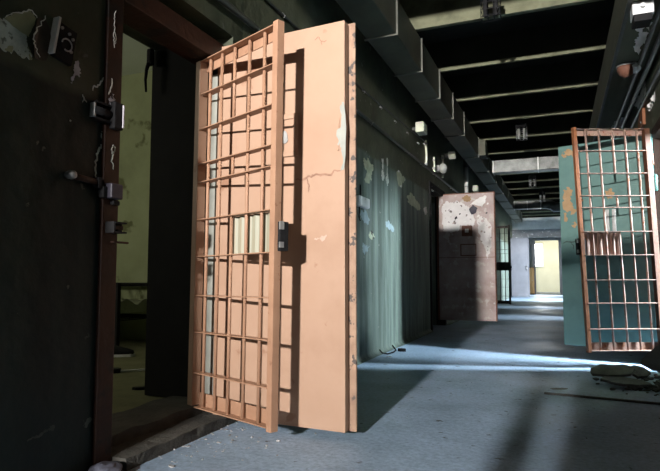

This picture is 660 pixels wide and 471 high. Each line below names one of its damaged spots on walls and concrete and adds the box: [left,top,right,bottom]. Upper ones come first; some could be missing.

peeling [0,9,51,61]
peeling [336,102,346,170]
crack [296,170,341,192]
peeling [363,157,373,183]
peeling [360,209,375,255]
peeling [442,195,492,259]